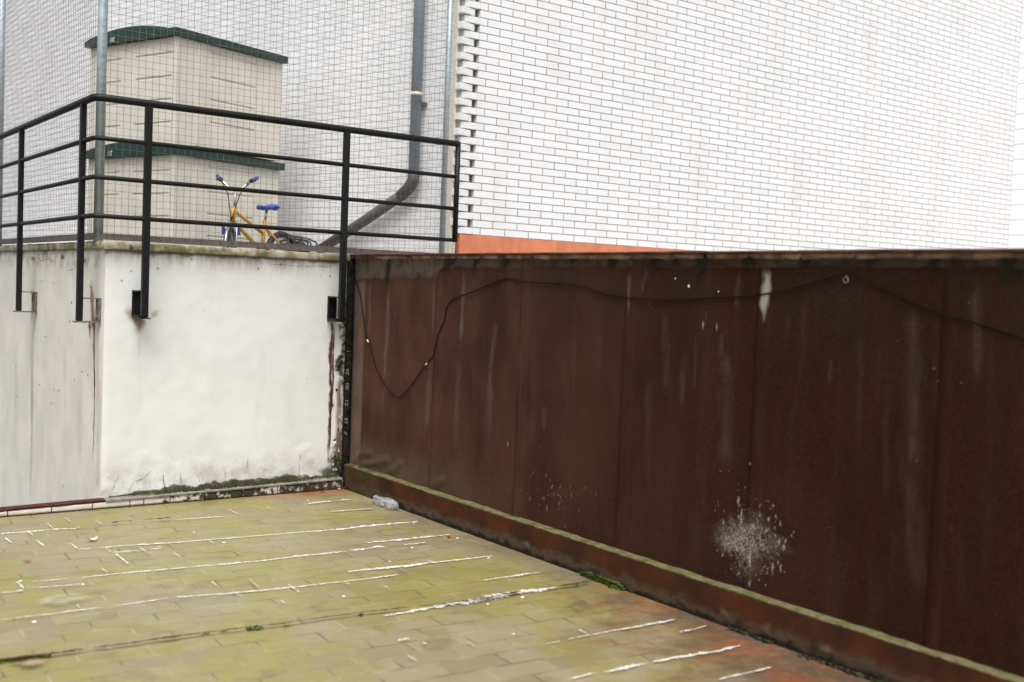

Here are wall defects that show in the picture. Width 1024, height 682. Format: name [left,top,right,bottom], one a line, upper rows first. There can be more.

water stain [760,274,770,311]
corrosion [327,323,342,448]